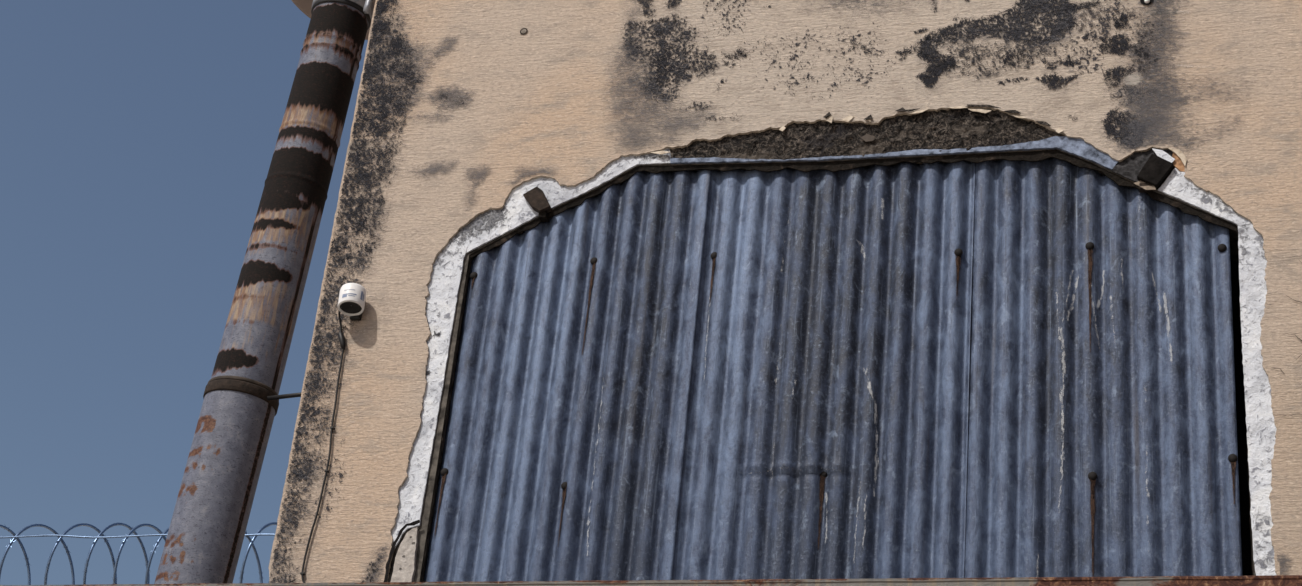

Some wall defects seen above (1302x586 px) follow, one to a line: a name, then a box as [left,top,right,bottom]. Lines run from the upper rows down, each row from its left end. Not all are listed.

water stain [270,0,472,583]
rust [582,263,595,355]
spalling [391,104,1276,582]
water stain [609,0,1229,150]